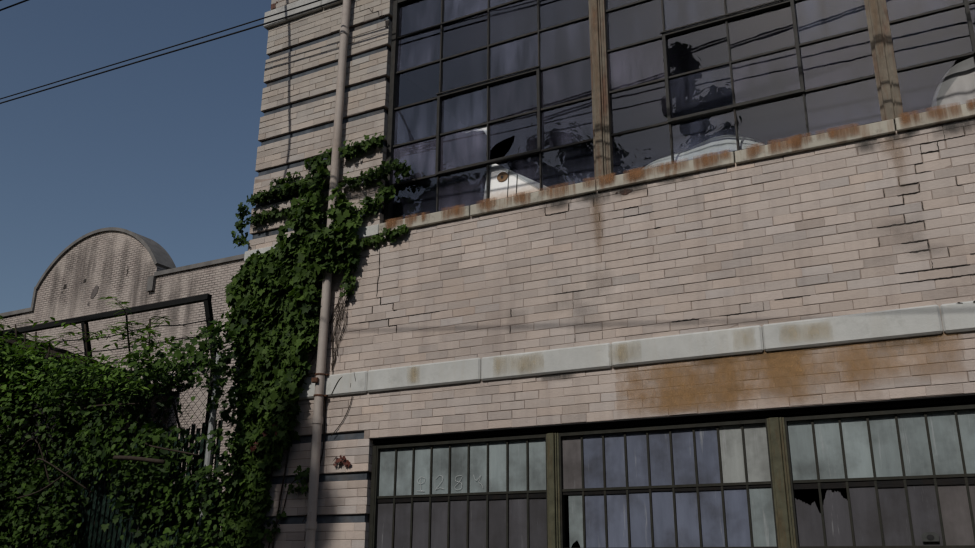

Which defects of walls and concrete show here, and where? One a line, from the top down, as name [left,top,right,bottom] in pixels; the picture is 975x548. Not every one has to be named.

corrosion [697,150,728,163]
crack [877,126,975,284]
crack [361,244,439,333]